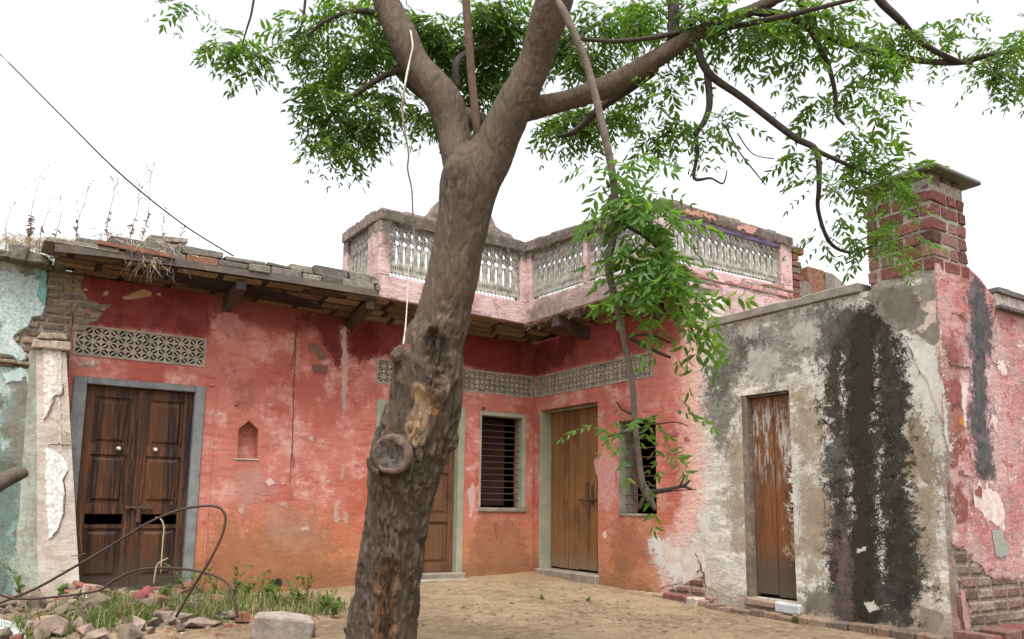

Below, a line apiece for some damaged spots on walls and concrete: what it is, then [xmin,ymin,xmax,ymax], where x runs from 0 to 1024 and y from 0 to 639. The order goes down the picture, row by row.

spalling [71,273,162,332]
peeling [2,367,29,383]
peeling [45,448,69,539]
peeling [308,325,349,413]
peeling [333,499,349,525]
water stain [731,273,1001,629]
peeling [906,291,1005,531]
peeling [996,357,1007,377]
spalling [950,542,1024,632]